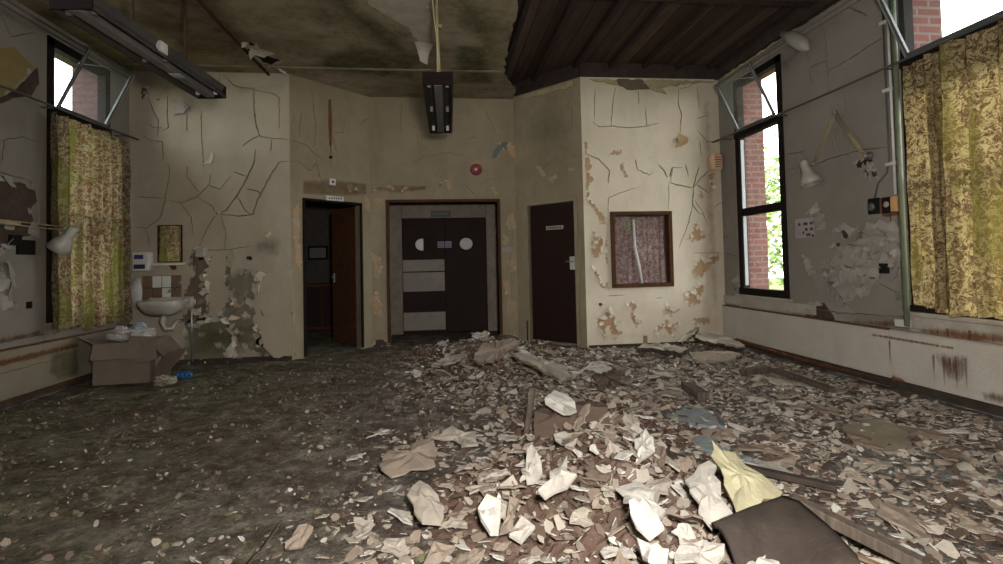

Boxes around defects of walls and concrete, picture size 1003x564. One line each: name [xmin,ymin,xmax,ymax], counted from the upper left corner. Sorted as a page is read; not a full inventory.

peeling [0,175,40,311]
corrosion [0,344,78,365]
crack [136,74,326,257]
peeling [182,202,302,365]
peeling [568,141,642,343]
crack [586,84,736,256]
peeling [675,133,688,148]
peeling [652,251,721,338]